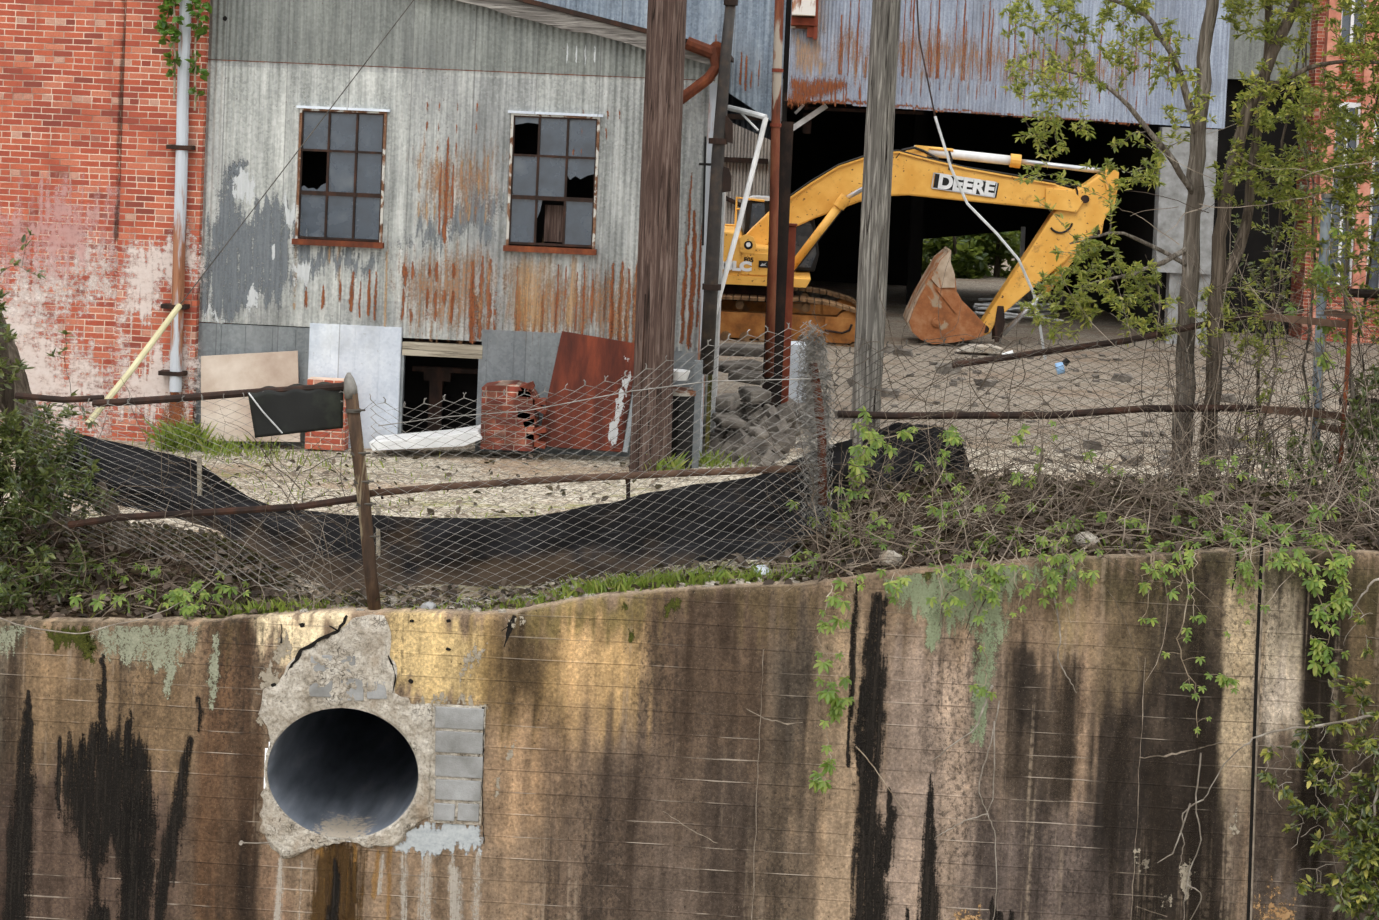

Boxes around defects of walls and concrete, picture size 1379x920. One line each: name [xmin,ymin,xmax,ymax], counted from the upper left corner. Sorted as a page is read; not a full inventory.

rust [787,0,870,107]
rust [895,0,1171,125]
peeling [200,159,504,323]
rust [304,102,637,452]
spalling [258,623,305,694]
crack [280,615,348,702]
spalling [408,642,488,712]
leakage [2,690,38,920]
leakage [54,653,204,920]
leakage [846,582,941,920]
leakage [989,897,1014,920]